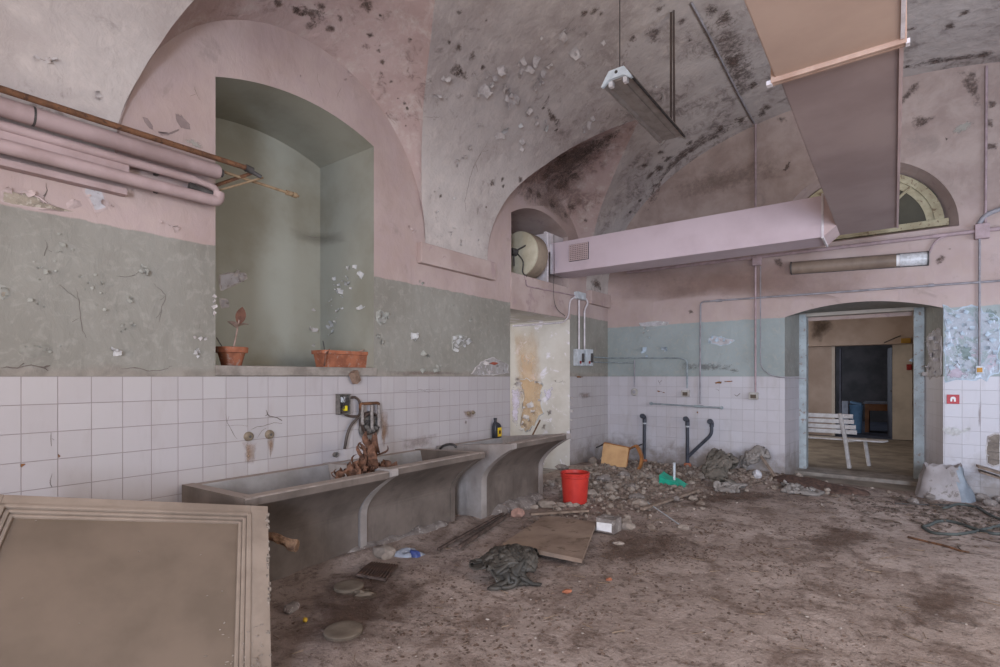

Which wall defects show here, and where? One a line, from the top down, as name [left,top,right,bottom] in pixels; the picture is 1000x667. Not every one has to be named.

damp [708,6,756,94]
peeling [473,55,553,152]
peeling [0,187,73,212]
peeling [82,188,114,213]
damp [519,135,615,207]
peeling [309,265,364,336]
peeling [452,335,473,352]
peeling [922,304,1000,383]
peeling [471,357,544,432]